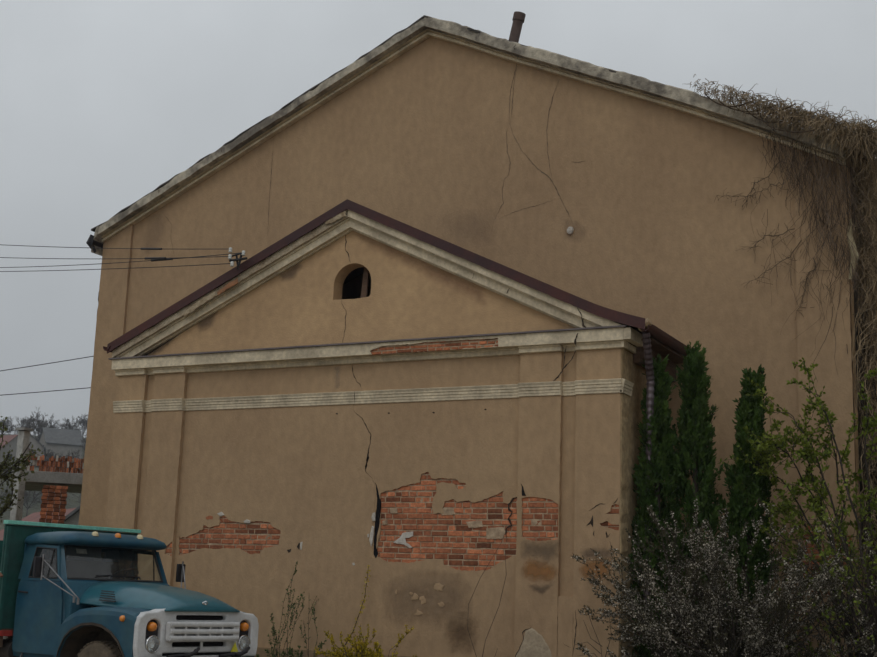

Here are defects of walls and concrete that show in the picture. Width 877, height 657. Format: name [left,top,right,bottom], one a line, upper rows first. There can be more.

crack [494,46,572,221]
flaking render [371,338,498,355]
crack [554,307,586,381]
crack [352,368,381,559]
flaking render [166,512,302,556]
flaking render [377,472,558,571]
flaking render [587,504,619,530]